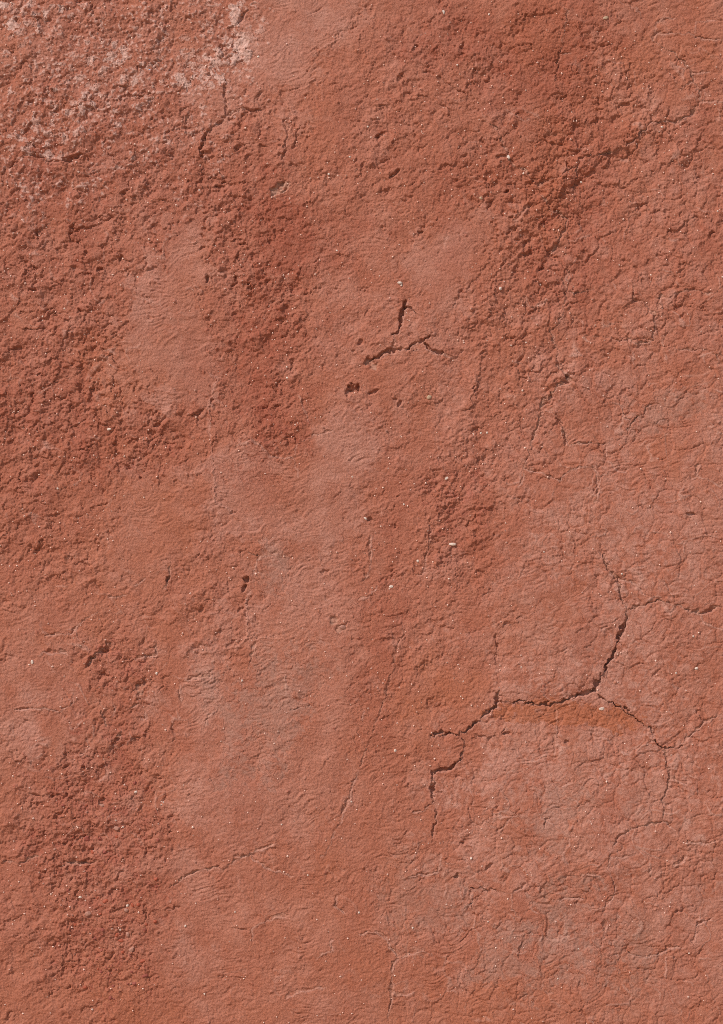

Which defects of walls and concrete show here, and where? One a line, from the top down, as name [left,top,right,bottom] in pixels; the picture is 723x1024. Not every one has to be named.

crack [373,301,455,359]
crack [539,553,639,707]
crack [686,604,719,626]
crack [412,692,501,828]
crack [659,716,715,793]